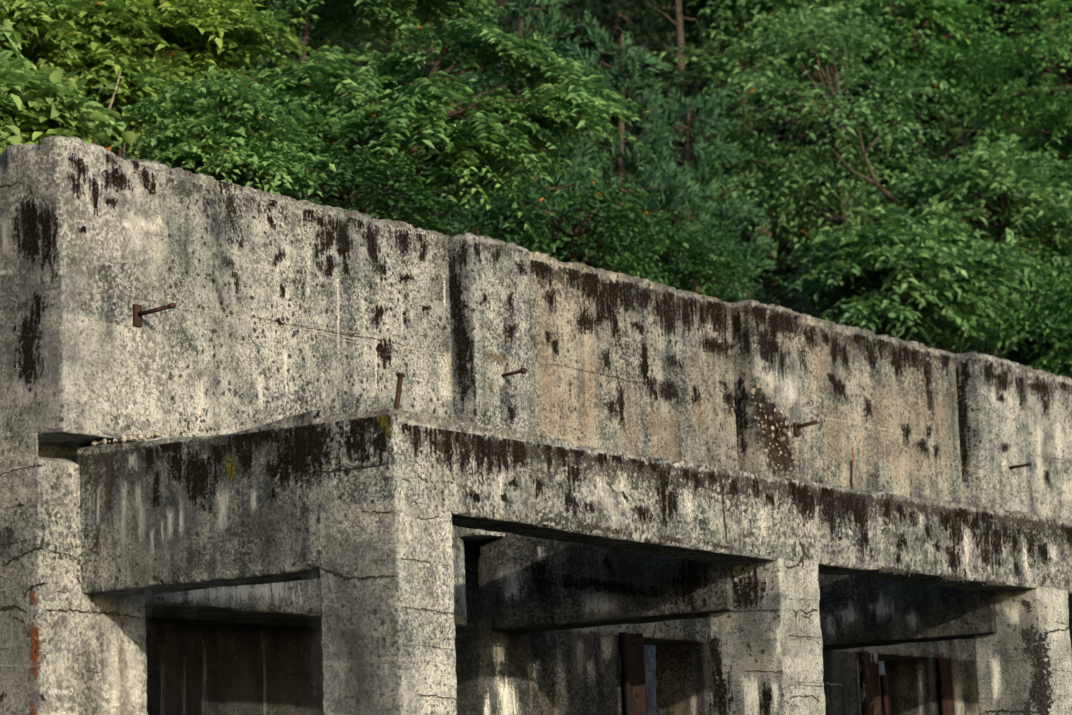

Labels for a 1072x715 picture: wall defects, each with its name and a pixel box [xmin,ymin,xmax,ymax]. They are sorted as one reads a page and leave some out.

damp [0,195,62,326]
damp [303,208,364,277]
damp [373,255,415,284]
damp [396,229,427,261]
spalling [747,372,799,478]
damp [880,498,1053,581]
corrosion [25,625,43,680]
damp [500,684,515,715]